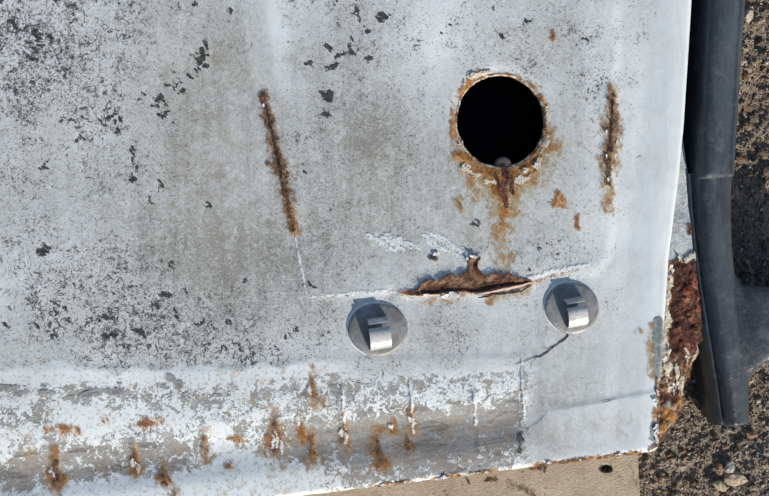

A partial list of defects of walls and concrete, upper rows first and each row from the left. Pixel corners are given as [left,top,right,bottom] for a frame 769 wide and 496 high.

rust [258,90,302,237]
rust [448,69,562,275]
rust [597,83,624,216]
peeling [0,385,56,397]
peeling [78,386,130,400]
peeling [164,374,185,389]
crack [516,334,569,369]
rust [534,259,703,467]
rust [43,423,81,496]
rust [155,456,177,496]
rust [264,405,324,471]
rust [367,407,418,487]